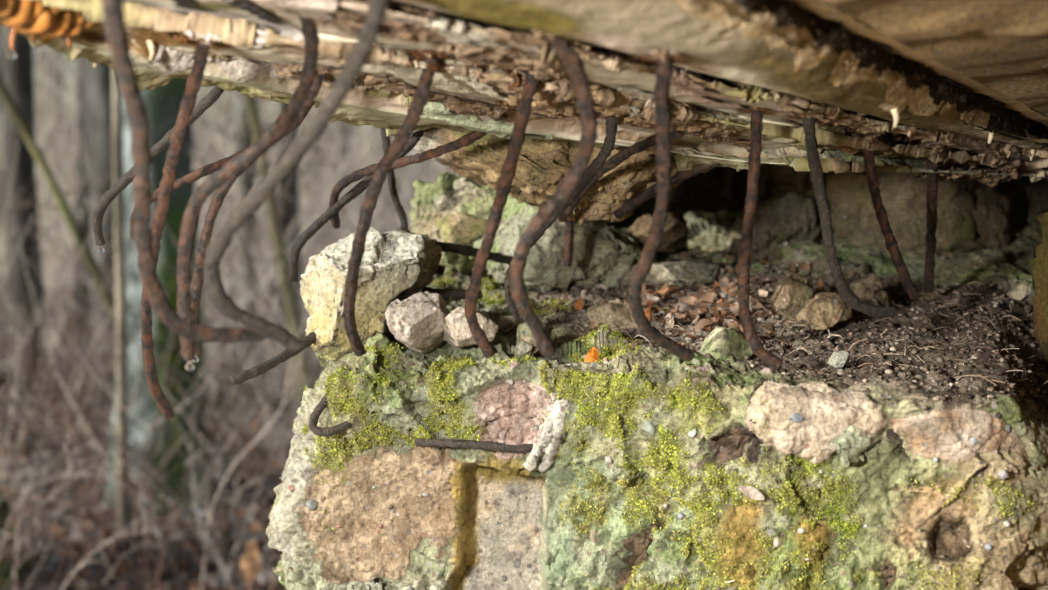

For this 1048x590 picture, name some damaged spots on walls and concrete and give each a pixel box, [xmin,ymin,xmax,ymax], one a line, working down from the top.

corrosion [0,0,103,42]
corrosion [127,27,231,56]
corrosion [395,48,457,75]
corrosion [504,68,531,92]
corrosion [631,53,695,64]
corrosion [725,101,859,154]
spalling [92,0,1035,468]
water stain [270,422,318,557]
water stain [538,451,595,590]
water stain [847,448,917,556]